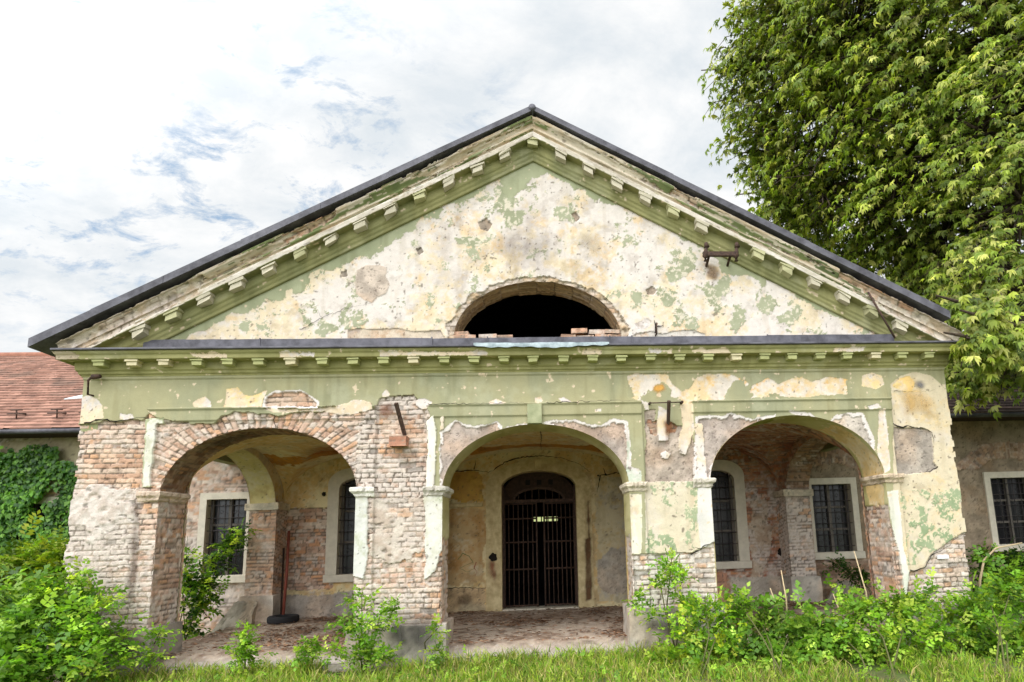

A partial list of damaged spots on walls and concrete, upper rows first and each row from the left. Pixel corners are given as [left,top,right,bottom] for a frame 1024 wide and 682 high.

peeling [52,115,962,361]
flaking render [64,387,528,630]
crack [455,432,620,490]
peeling [543,371,1024,608]